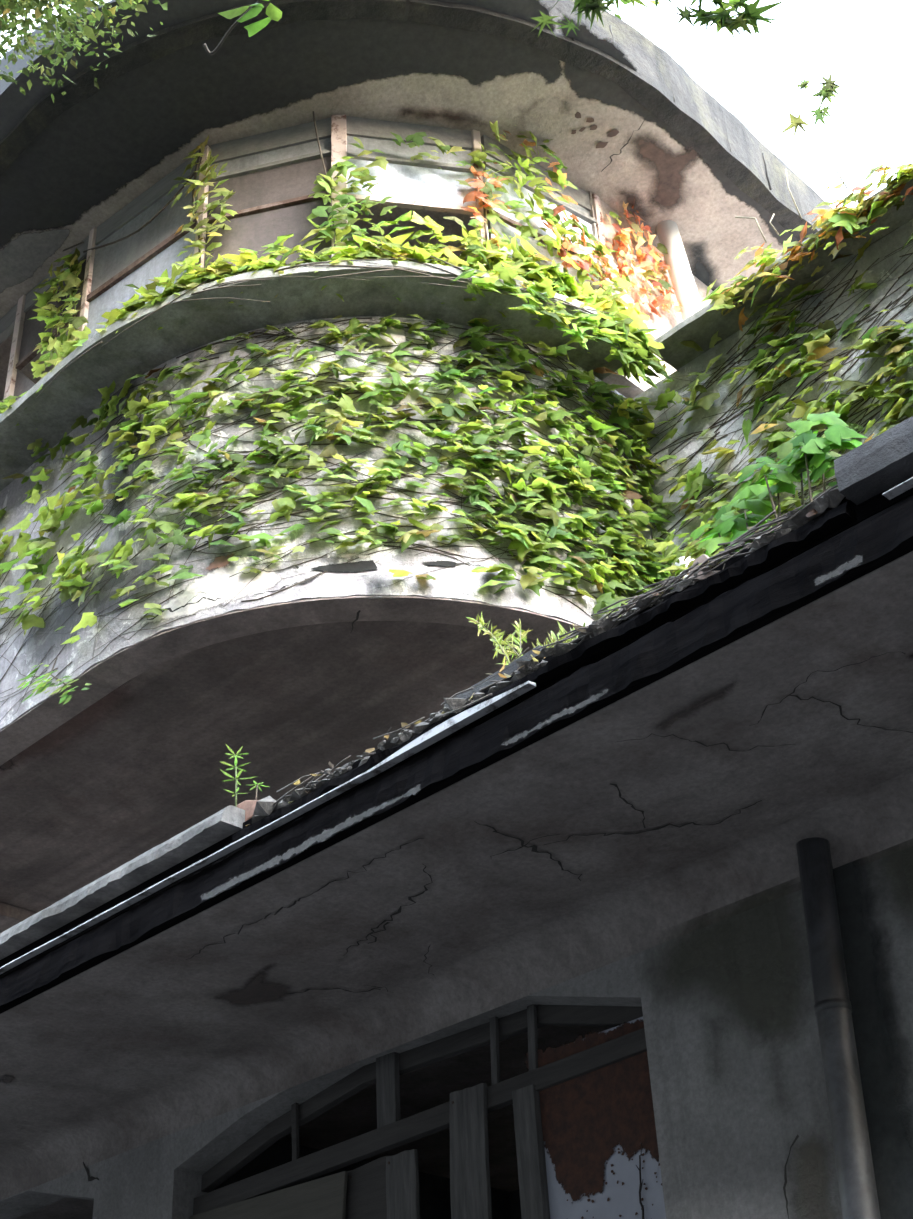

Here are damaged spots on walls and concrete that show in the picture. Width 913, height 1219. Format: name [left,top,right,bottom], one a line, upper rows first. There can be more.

crack [618,652,913,751]
crack [474,783,762,881]
crack [185,838,433,960]